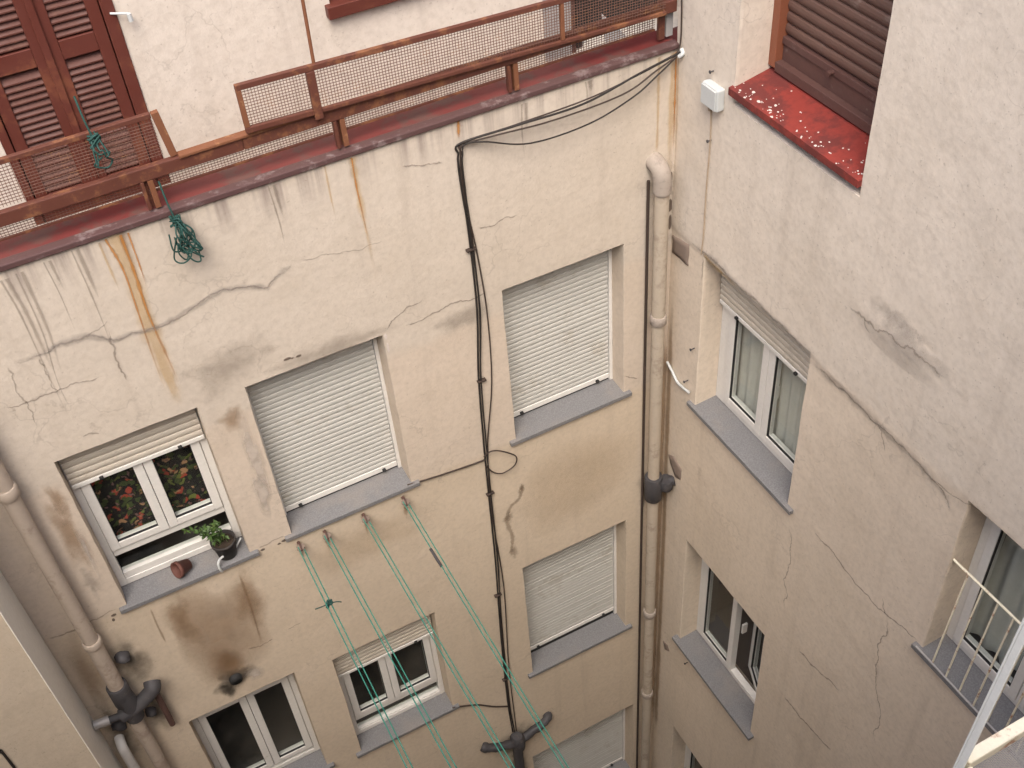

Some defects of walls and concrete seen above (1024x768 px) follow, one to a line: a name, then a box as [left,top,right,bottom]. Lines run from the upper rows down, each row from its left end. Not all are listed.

corrosion [105,233,159,338]